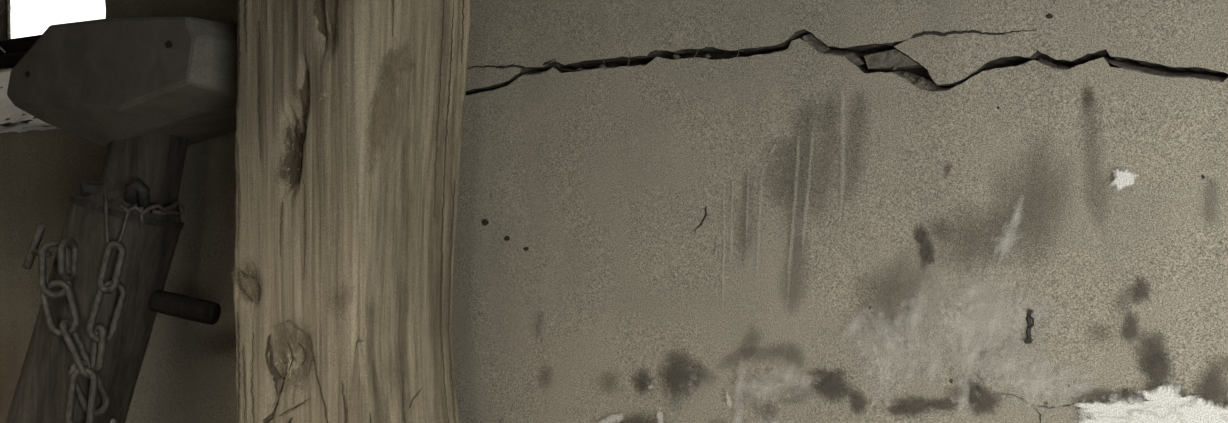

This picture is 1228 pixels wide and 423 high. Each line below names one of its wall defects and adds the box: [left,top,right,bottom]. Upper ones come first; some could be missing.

crack [465,29,1228,96]
crack [0,119,33,127]
water stain [996,190,1046,256]
water stain [726,280,1228,423]
water stain [599,404,677,423]
flaking render [1077,386,1228,423]